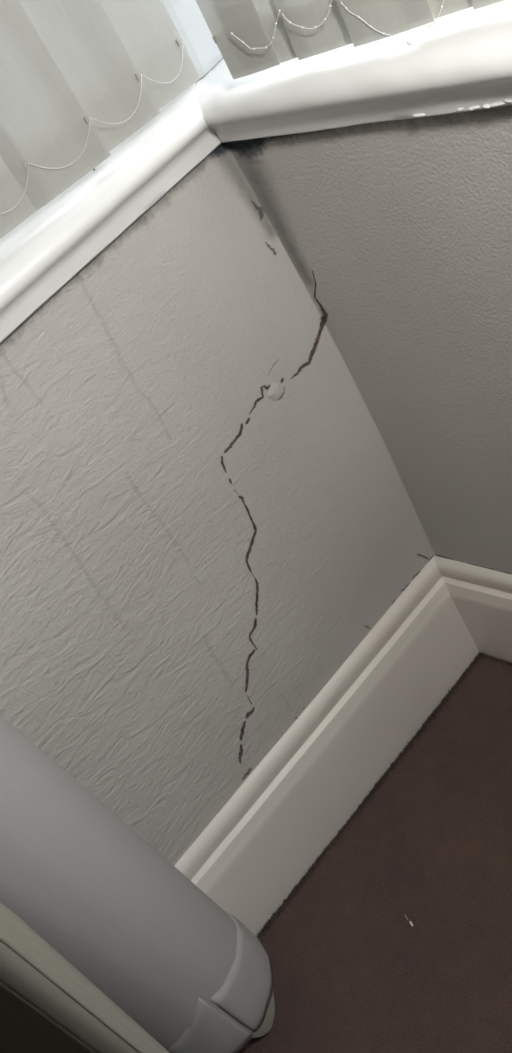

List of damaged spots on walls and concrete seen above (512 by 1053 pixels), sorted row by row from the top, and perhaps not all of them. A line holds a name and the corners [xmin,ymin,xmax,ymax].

crack [221,271,328,764]